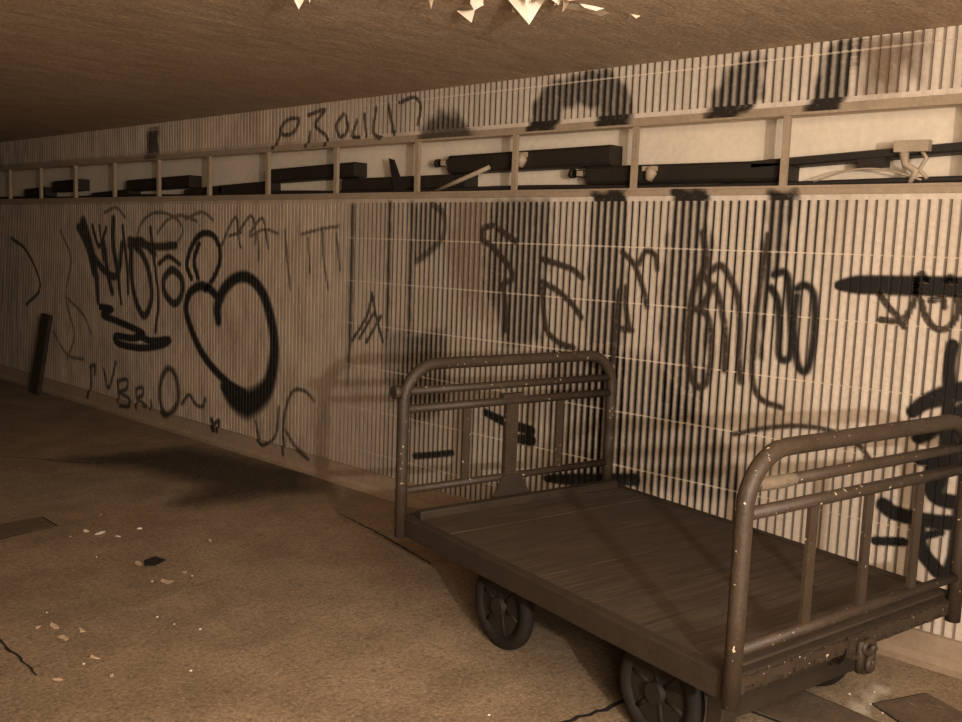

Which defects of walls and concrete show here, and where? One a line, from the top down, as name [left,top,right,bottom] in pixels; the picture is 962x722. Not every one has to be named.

peeling [457,0,483,23]
peeling [508,0,609,24]
crack [0,638,37,675]
crack [560,699,624,722]